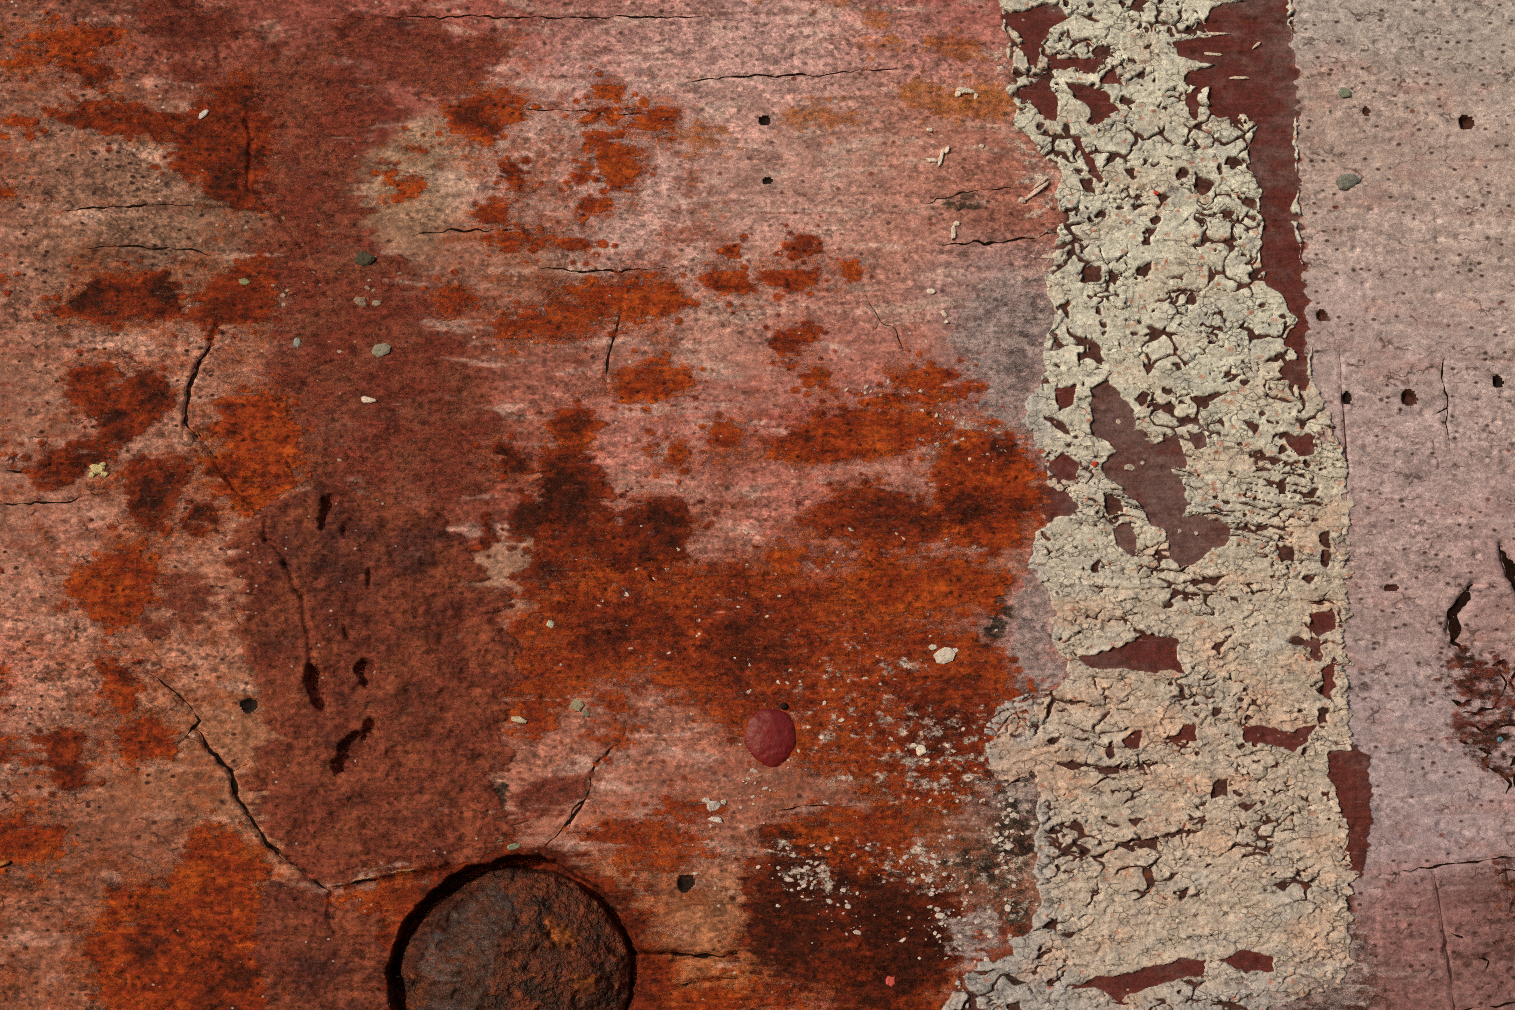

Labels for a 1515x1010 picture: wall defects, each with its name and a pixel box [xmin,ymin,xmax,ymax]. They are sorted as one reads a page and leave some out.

corrosion [0,0,283,229]
corrosion [0,250,312,885]
crack [182,326,269,517]
corrosion [311,0,1055,1010]
peeling [941,0,1373,1010]
corrosion [65,809,287,1010]
crack [146,671,331,918]